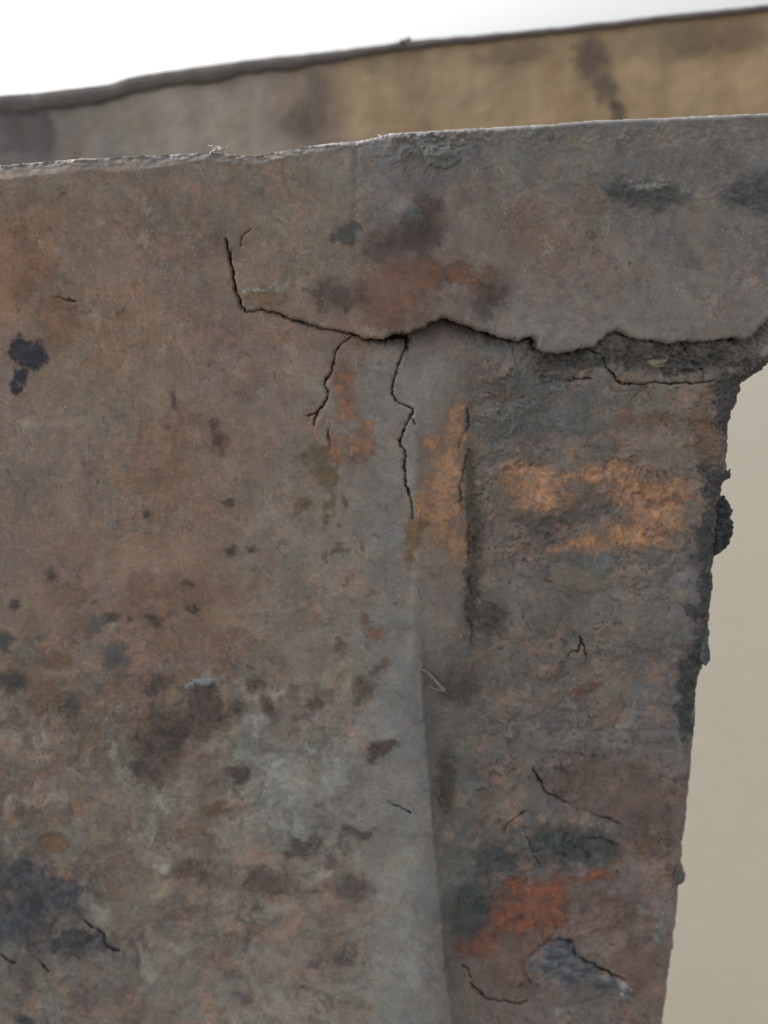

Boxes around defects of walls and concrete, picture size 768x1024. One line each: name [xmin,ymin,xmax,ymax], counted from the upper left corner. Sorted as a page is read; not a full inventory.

crack [227,229,251,310]
crack [308,333,415,512]
corrosion [403,403,469,563]
corrosion [503,460,686,556]
crack [533,769,621,857]
crack [462,937,625,1004]